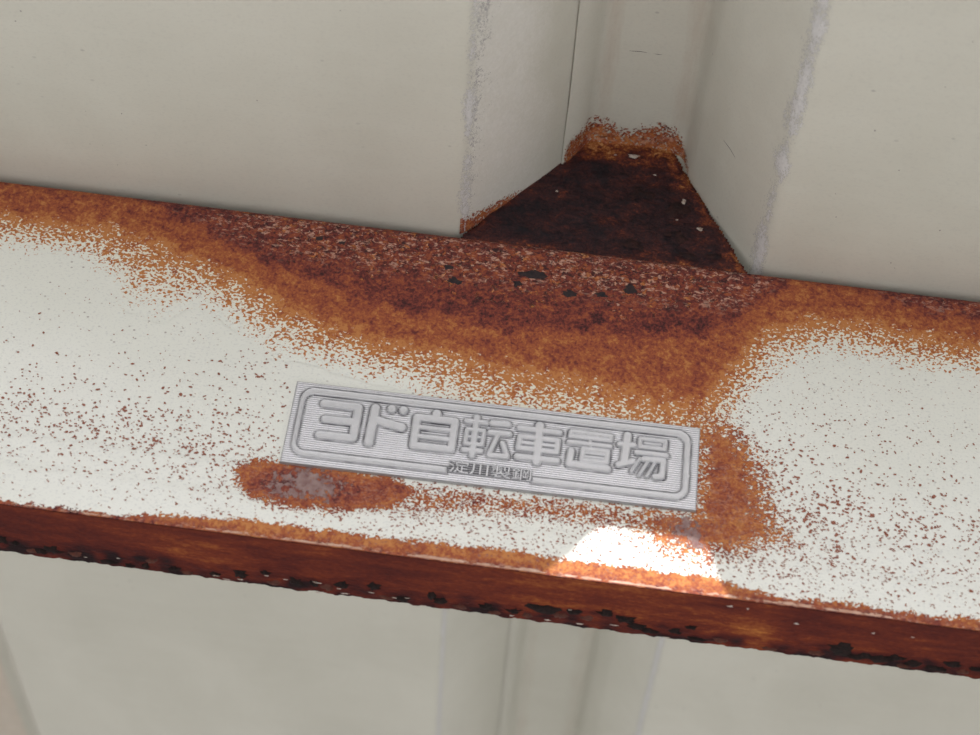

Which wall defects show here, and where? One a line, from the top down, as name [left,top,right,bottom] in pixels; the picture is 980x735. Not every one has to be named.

corrosion [564,115,688,174]
corrosion [0,182,980,631]
corrosion [478,603,728,643]
corrosion [808,642,980,674]